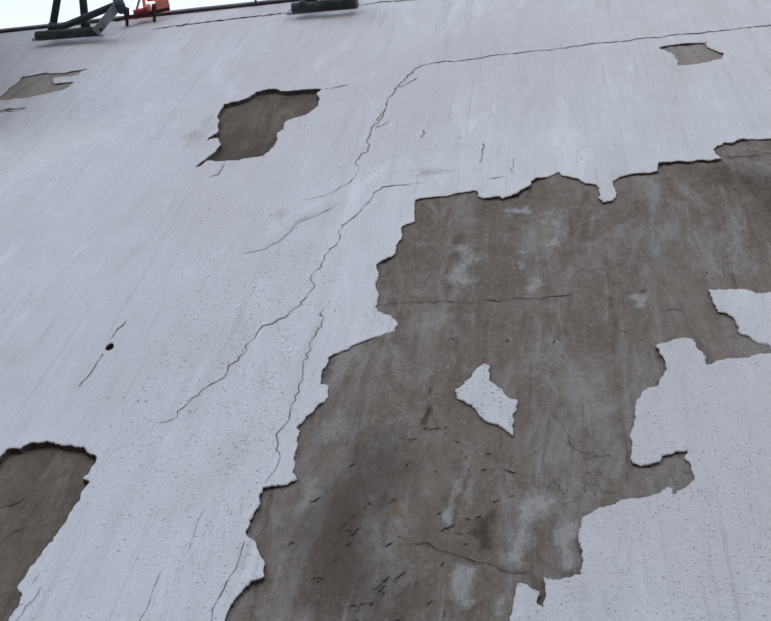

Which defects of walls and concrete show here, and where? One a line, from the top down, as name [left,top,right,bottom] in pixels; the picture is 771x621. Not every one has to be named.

flaking render [0,71,81,100]
crack [156,12,287,29]
flaking render [664,44,723,65]
flaking render [212,93,319,161]
crack [154,25,770,422]
crack [264,303,329,484]
flaking render [226,140,771,621]
flaking render [0,446,96,621]
crack [211,541,245,621]